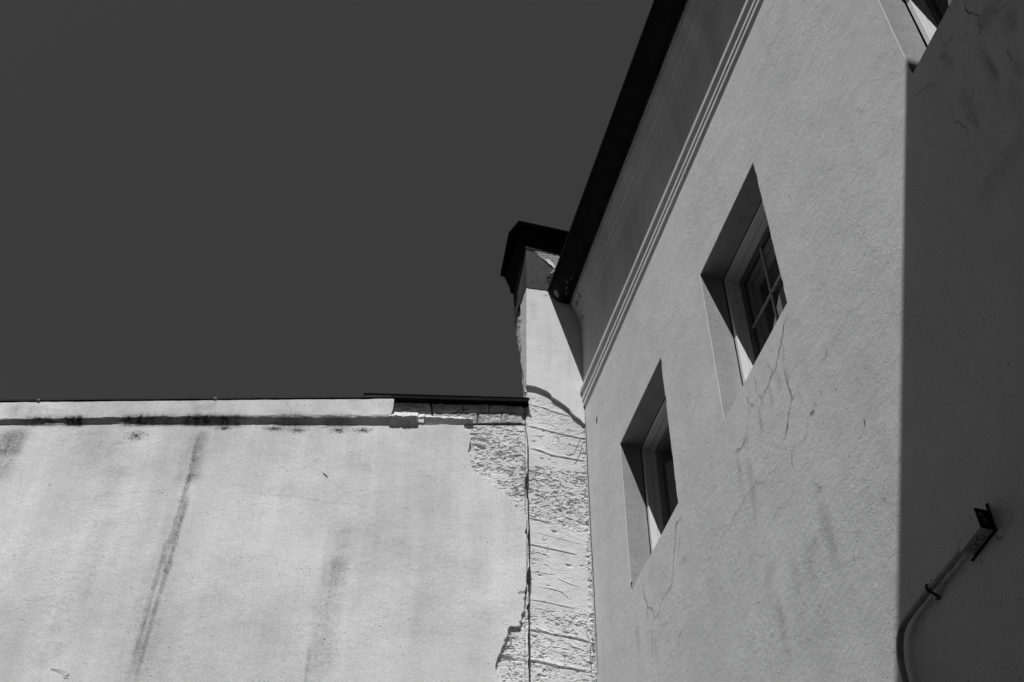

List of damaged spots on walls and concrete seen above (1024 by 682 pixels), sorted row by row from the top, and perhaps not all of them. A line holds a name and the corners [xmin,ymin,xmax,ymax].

spalling [464,388,597,682]
crack [746,320,815,466]